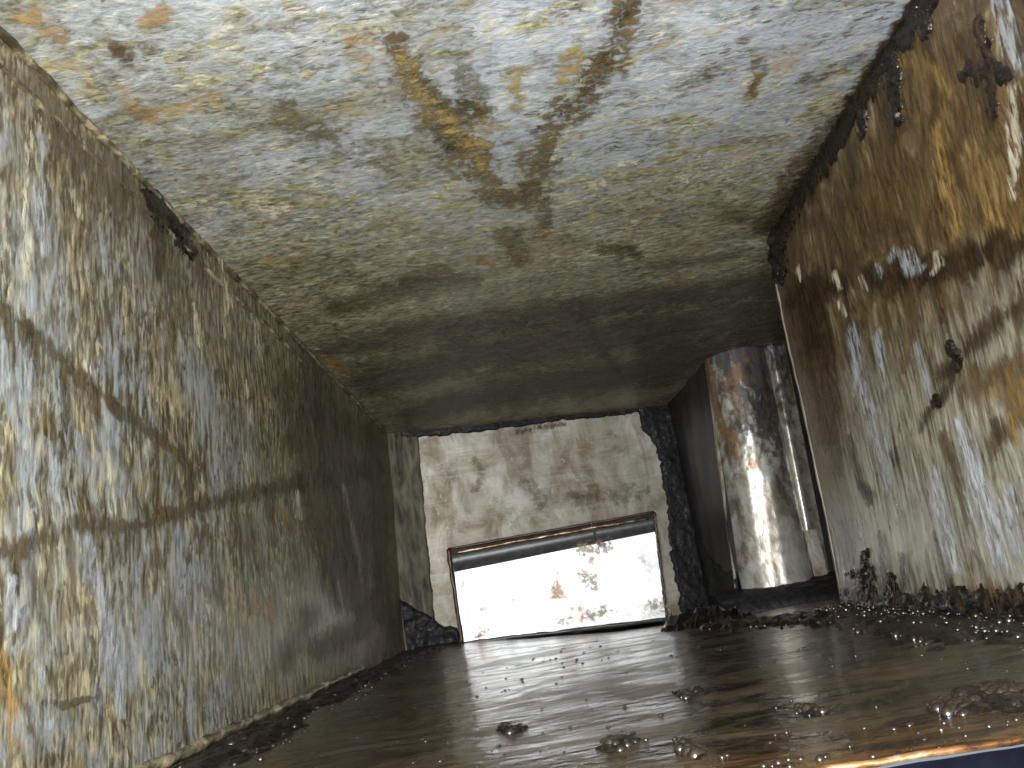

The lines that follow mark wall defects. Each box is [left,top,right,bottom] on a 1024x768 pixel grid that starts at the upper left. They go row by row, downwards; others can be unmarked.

peeling [999,0,1021,67]
rust [381,30,502,203]
rust [506,66,528,112]
rust [514,0,642,196]
rust [821,26,1024,267]
peeling [1007,91,1018,197]
peeling [832,271,847,318]
peeling [890,249,921,274]
leakage [282,227,1024,672]